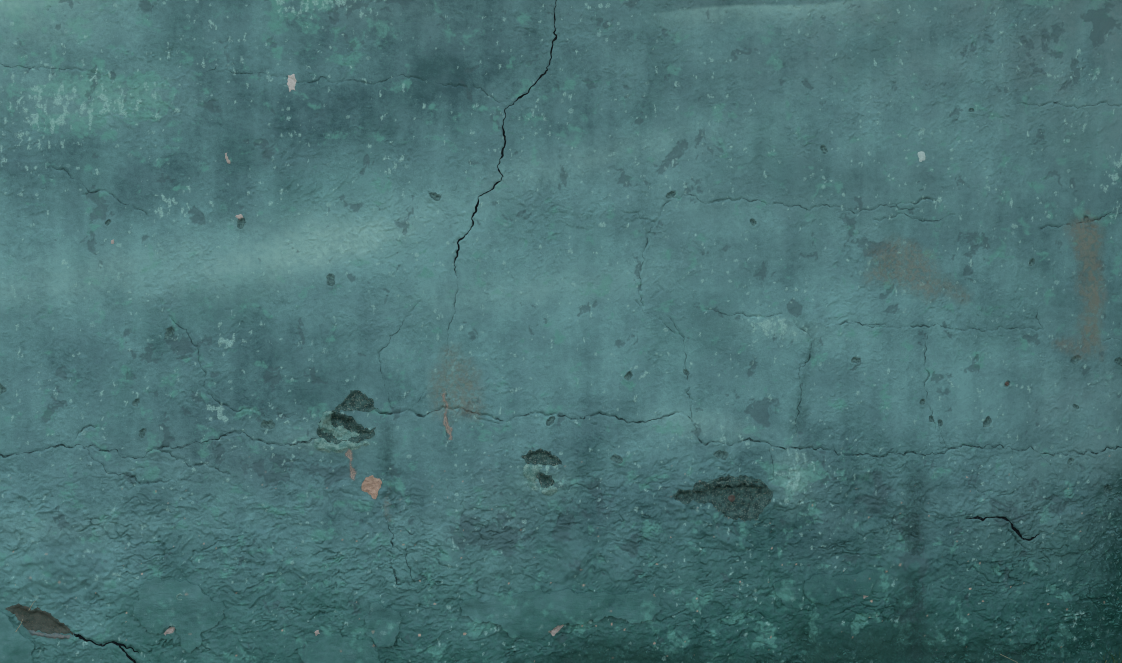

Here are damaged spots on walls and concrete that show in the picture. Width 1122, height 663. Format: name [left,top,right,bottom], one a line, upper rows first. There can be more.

crack [451,0,557,322]
spalling [313,390,378,453]
spalling [361,475,382,499]
spalling [522,448,562,496]
spalling [665,475,773,552]
spalling [6,603,73,639]